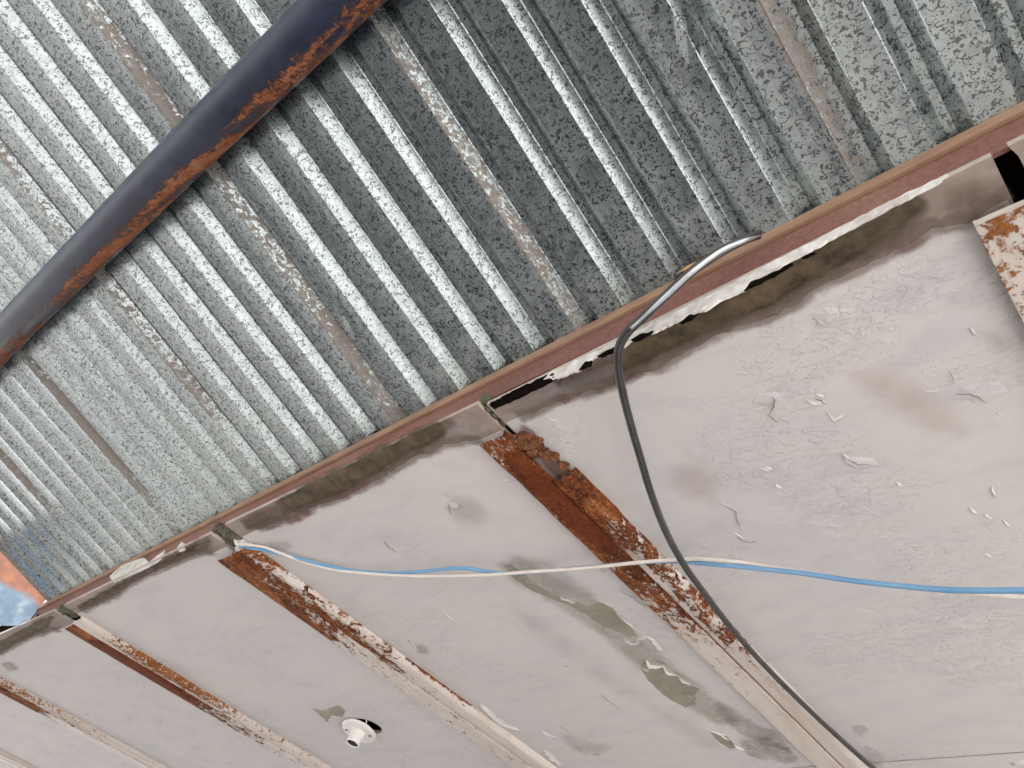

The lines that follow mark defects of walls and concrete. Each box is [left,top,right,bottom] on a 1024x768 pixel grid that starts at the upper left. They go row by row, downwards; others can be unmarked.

corrosion [0,0,384,367]
spalling [579,347,614,371]
spalling [631,330,654,342]
leakage [518,195,1006,419]
spalling [744,253,816,292]
corrosion [977,206,1024,315]
corrosion [480,427,774,685]
corrosion [0,677,124,753]
corrosion [65,624,321,766]
corrosion [218,542,476,734]
peeling [504,563,701,707]